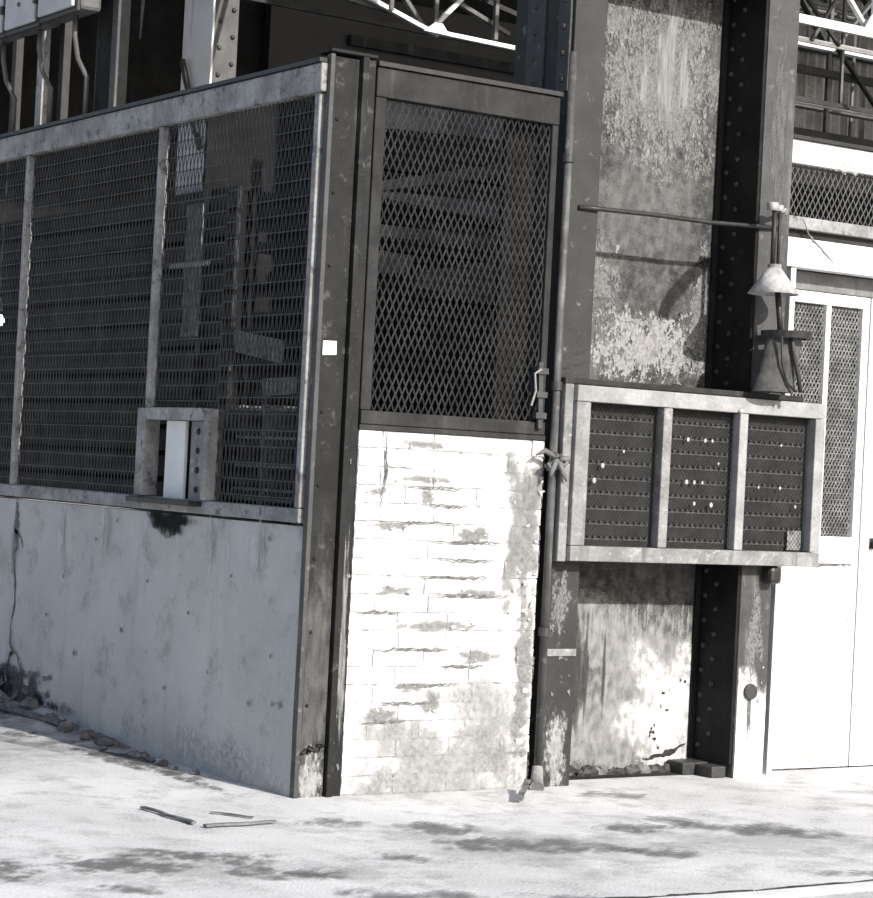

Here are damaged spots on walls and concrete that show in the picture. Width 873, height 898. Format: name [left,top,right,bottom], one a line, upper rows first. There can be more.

leakage [149,510,187,536]
crack [0,502,23,695]
leakage [347,674,522,796]
corrosion [569,743,686,776]